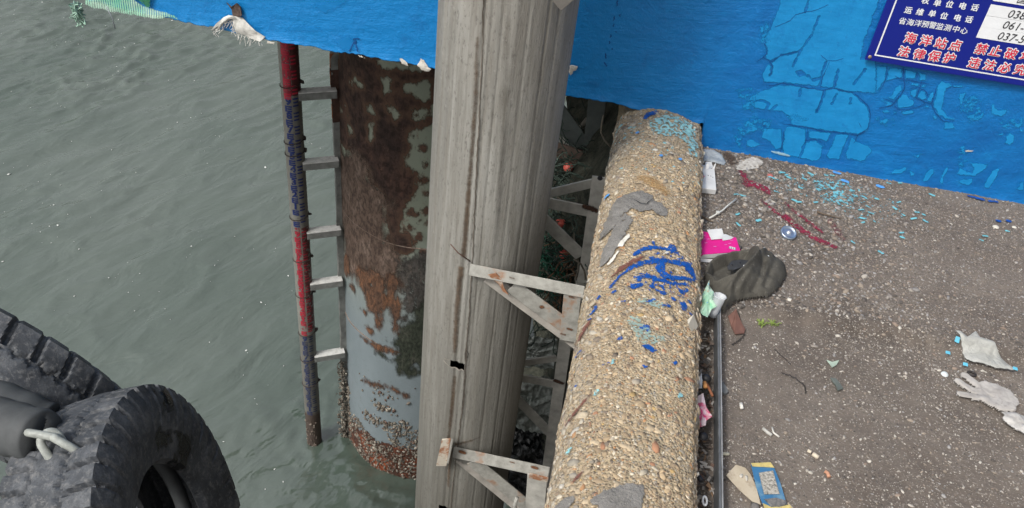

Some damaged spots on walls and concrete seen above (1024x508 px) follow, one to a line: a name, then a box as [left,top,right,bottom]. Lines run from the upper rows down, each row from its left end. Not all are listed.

crack [757,4,955,152]
peeling [734,0,1023,161]
rust [338,52,435,355]
peeling [891,146,999,188]
rust [349,422,418,479]
rust [362,379,409,399]